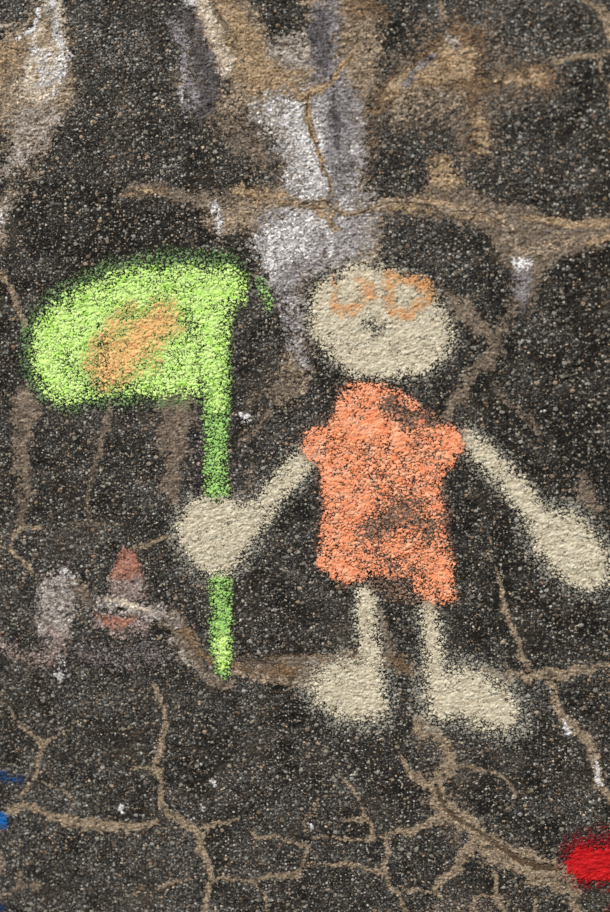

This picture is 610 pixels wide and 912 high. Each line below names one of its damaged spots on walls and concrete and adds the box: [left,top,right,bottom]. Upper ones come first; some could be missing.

crack [0,21,29,29]
crack [208,0,246,69]
crack [438,0,447,20]
crack [551,0,610,108]
crack [295,43,610,246]
crack [0,523,45,574]
crack [130,533,176,550]
crack [479,536,610,802]
crack [1,683,608,912]